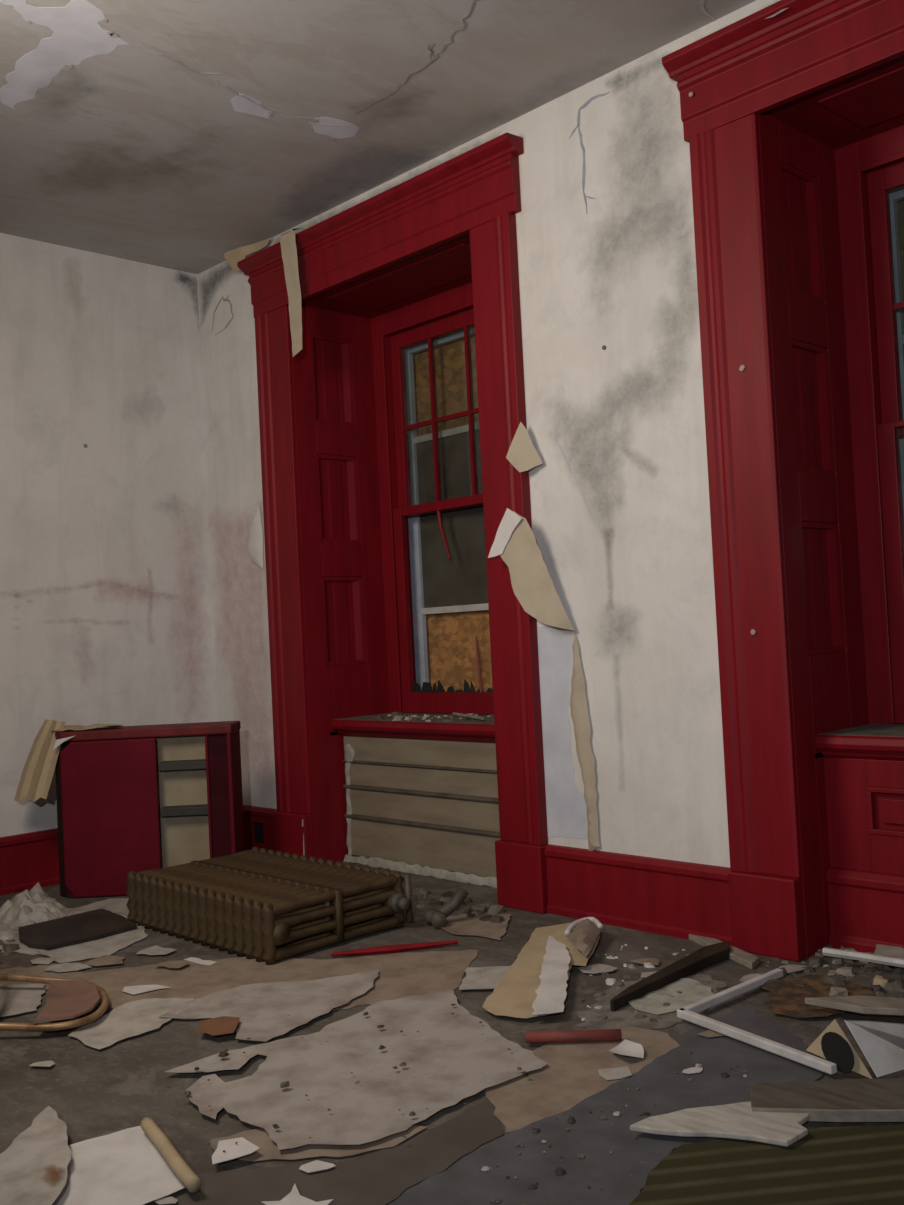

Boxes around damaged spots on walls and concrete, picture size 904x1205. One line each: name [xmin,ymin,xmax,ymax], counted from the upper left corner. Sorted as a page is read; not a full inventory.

peeling [0,0,128,110]
peeling [230,93,275,118]
peeling [308,117,359,140]
crack [355,0,478,114]
crack [569,92,610,213]
peeling [488,508,522,558]
flaking render [537,626,588,839]
damp [570,631,600,851]